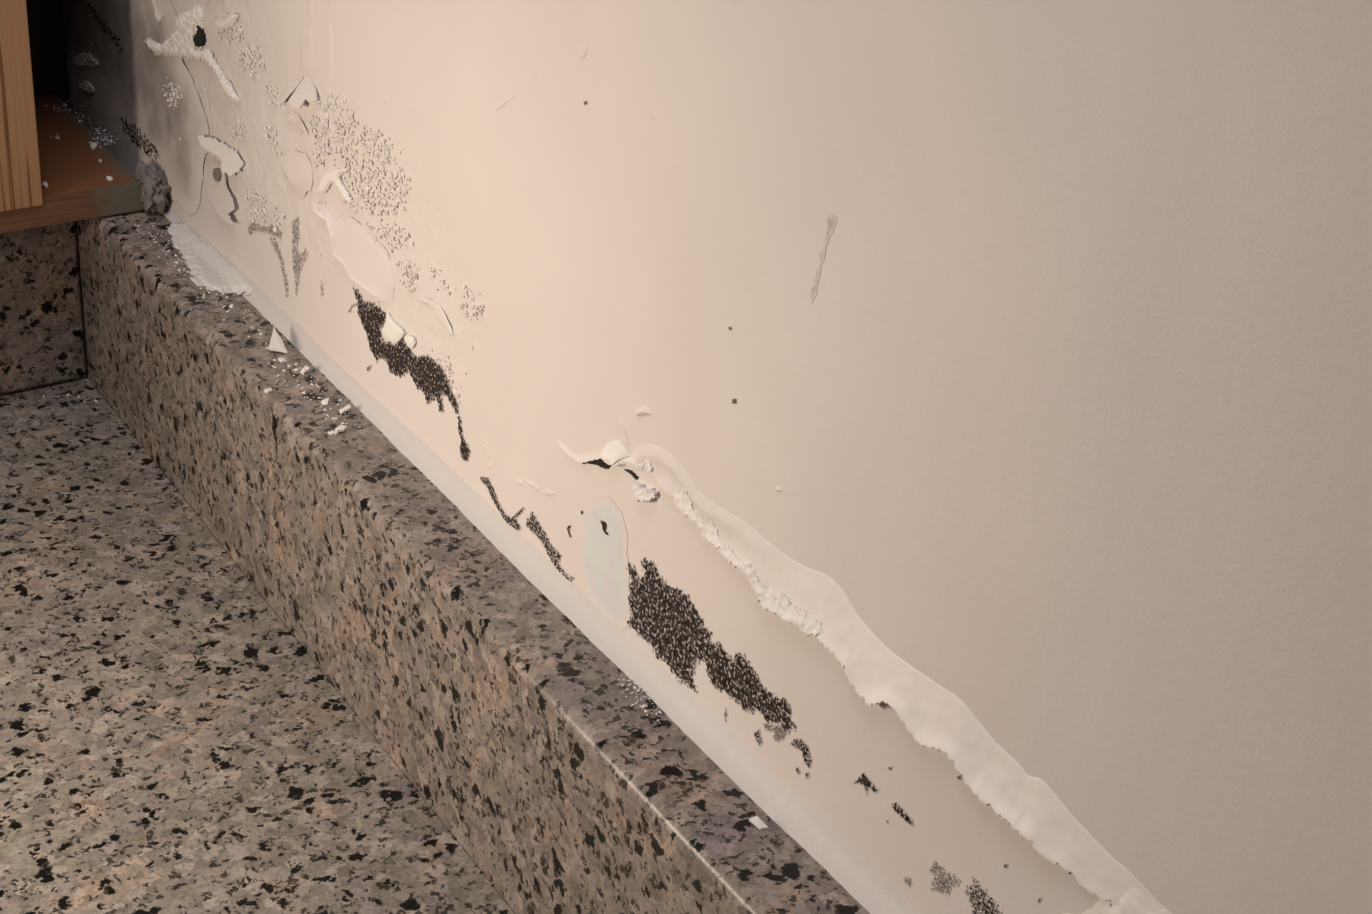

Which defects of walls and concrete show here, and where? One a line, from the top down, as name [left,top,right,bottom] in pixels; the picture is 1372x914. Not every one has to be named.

peeling [150,0,168,22]
peeling [278,74,318,108]
peeling [198,135,244,225]
peeling [312,202,395,303]
leakage [348,288,471,461]
leakage [480,476,812,779]
peeling [558,418,1163,908]
mould [929,859,1002,914]